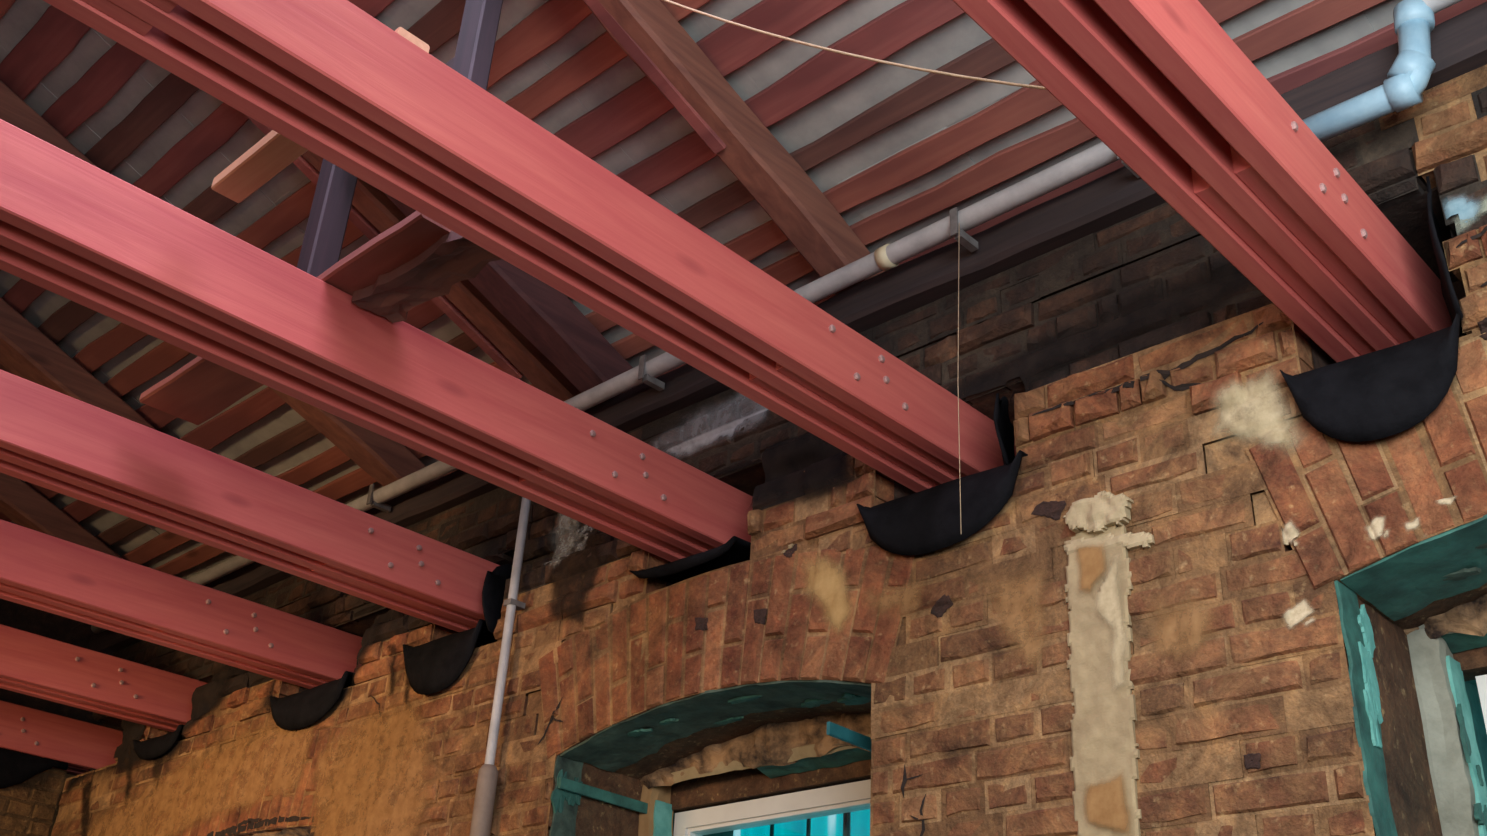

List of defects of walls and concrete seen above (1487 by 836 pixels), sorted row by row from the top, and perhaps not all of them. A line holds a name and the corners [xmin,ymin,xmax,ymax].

crack [1456,226,1487,248]
crack [901,764,926,836]